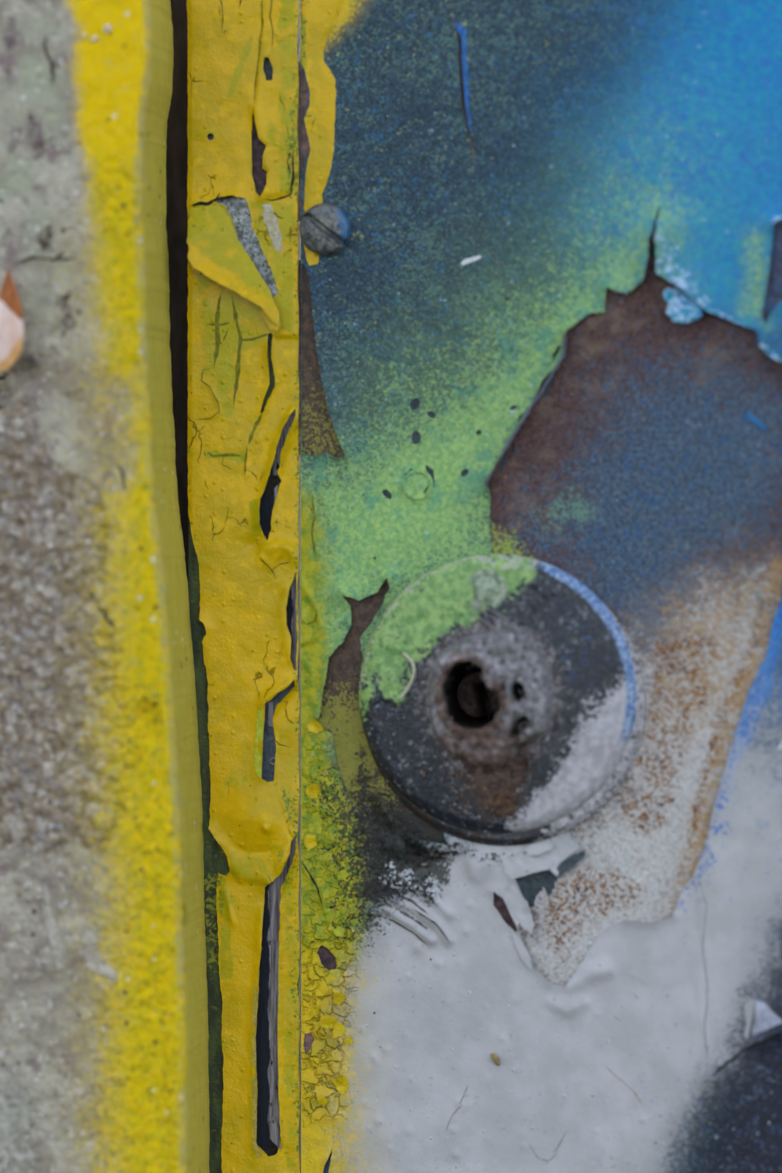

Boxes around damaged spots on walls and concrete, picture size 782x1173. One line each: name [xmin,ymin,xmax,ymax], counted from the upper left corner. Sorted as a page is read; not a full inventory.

crack [220,0,274,110]
crack [191,193,234,206]
peeling [187,112,281,413]
crack [266,152,294,201]
crack [198,294,270,475]
peeling [254,574,316,782]
peeling [306,578,447,844]
peeling [488,207,782,987]
rust [689,654,752,841]
peeling [251,831,317,1157]
peeling [304,945,353,1055]
peeling [709,999,782,1079]